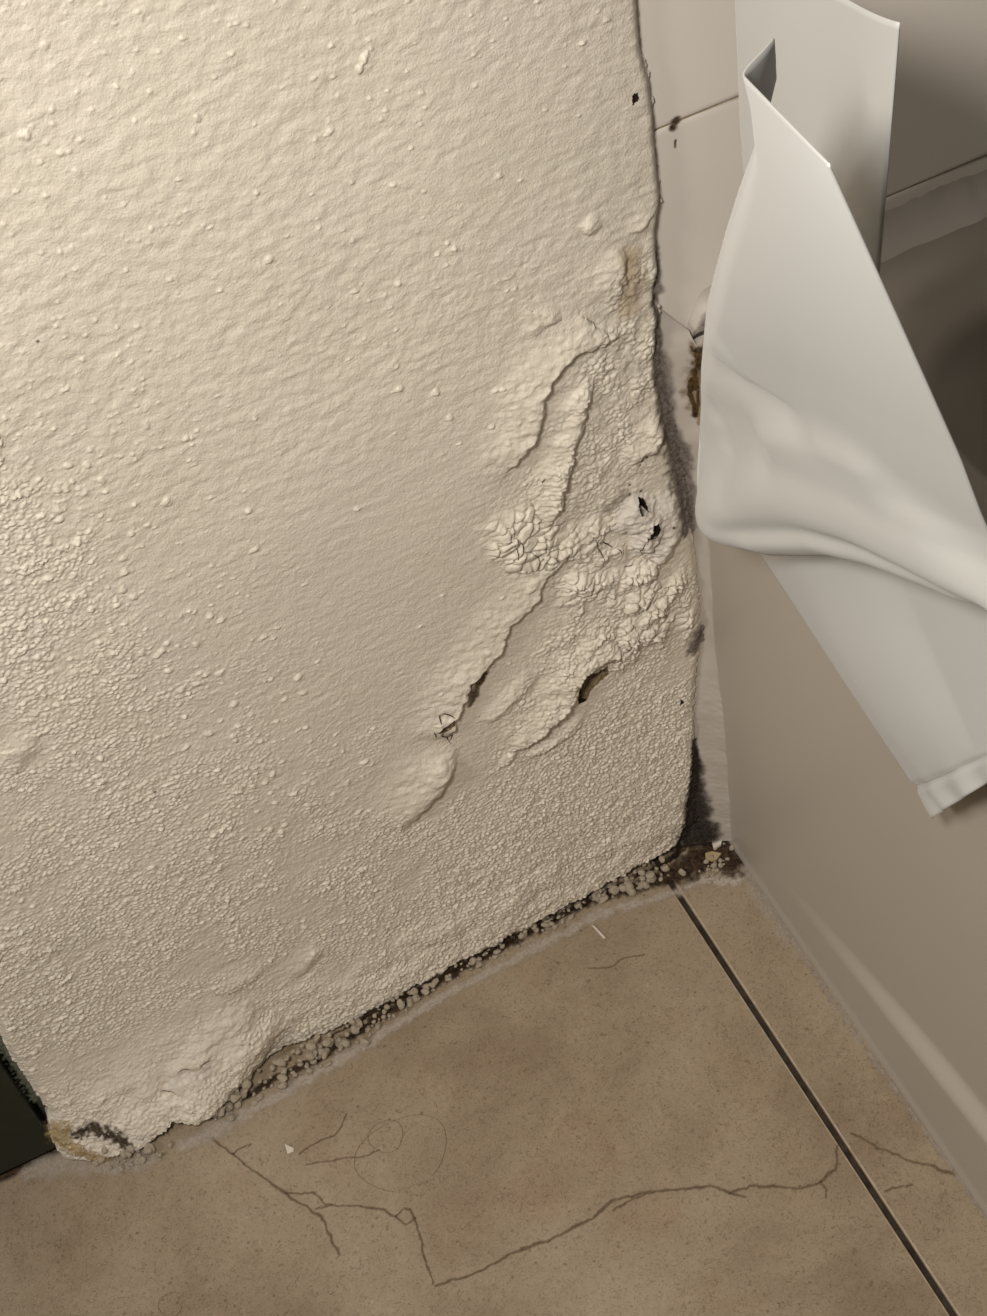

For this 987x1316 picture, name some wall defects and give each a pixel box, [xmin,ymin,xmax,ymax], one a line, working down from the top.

rust [682,344,703,425]
peeling [408,497,698,768]
spalling [213,842,734,1122]
spalling [74,1131,174,1172]
crack [211,1114,955,1286]